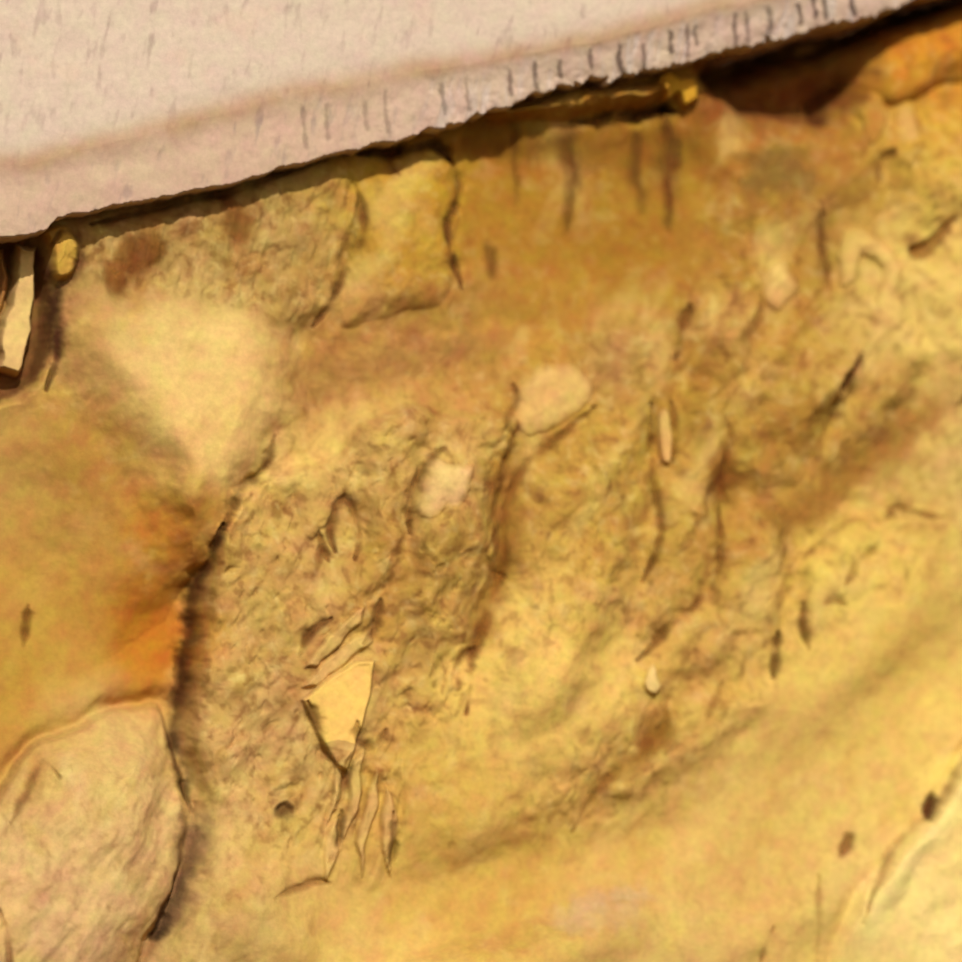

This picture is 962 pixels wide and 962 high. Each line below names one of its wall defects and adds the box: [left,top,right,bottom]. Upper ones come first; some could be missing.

damp [660,117,681,222]
crack [171,459,270,707]
spalling [179,402,519,884]
crack [469,625,485,659]
crack [168,734,188,803]